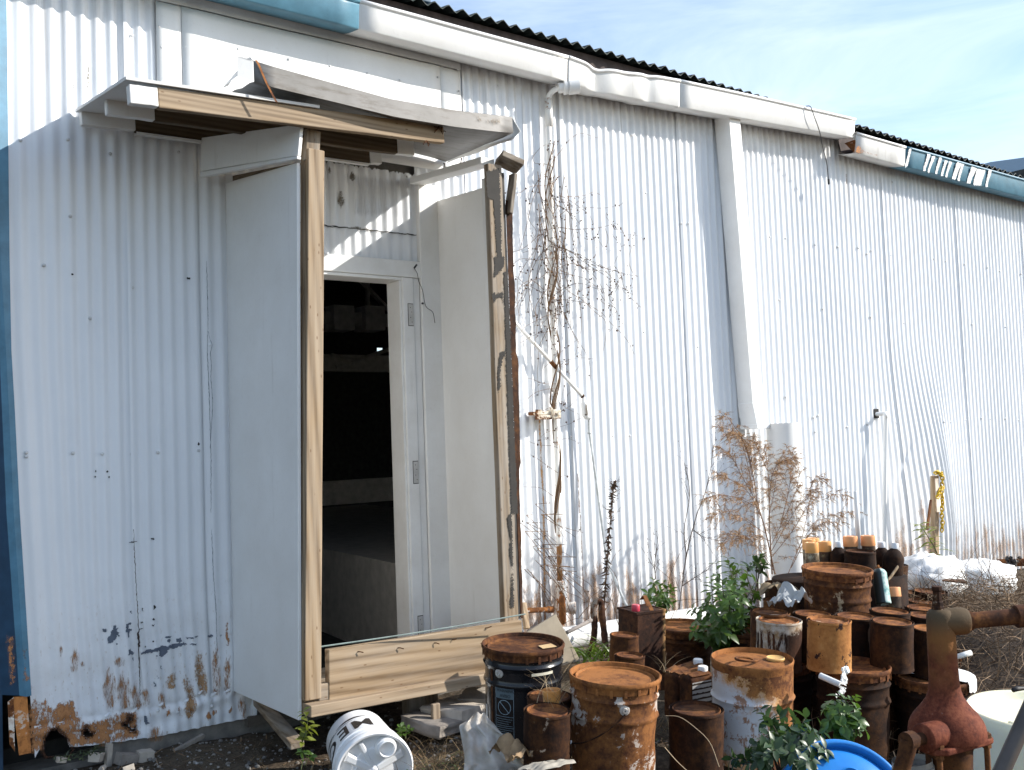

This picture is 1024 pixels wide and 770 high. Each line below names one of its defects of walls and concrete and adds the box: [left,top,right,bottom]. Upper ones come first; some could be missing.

rust [506,200,555,632]
rust [8,637,29,684]
crack [133,529,141,706]
rust [29,623,246,753]
peeling [103,605,222,669]